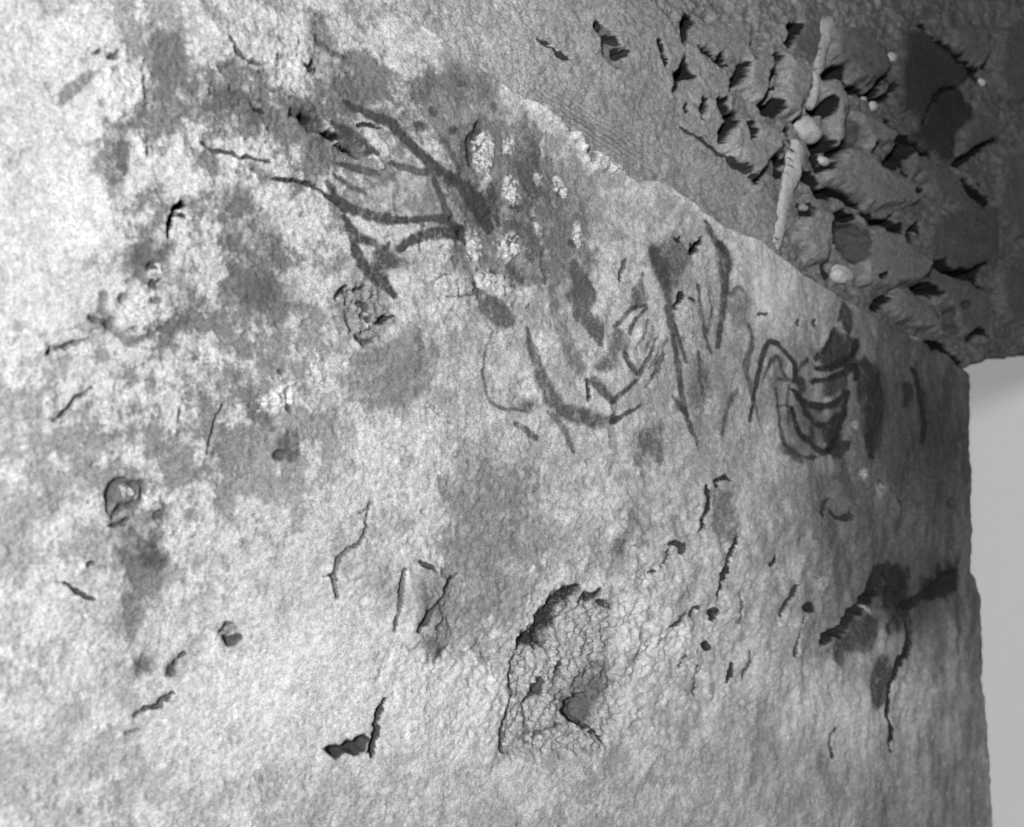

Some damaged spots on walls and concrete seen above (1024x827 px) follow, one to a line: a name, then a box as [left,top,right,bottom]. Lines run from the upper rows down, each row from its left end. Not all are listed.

damp [858,358,884,459]
damp [903,367,927,443]
damp [273,430,299,461]
damp [963,440,971,484]
crack [323,501,374,599]
crack [394,560,458,633]
damp [869,656,892,709]
crack [884,620,912,753]
spalling [323,697,386,760]